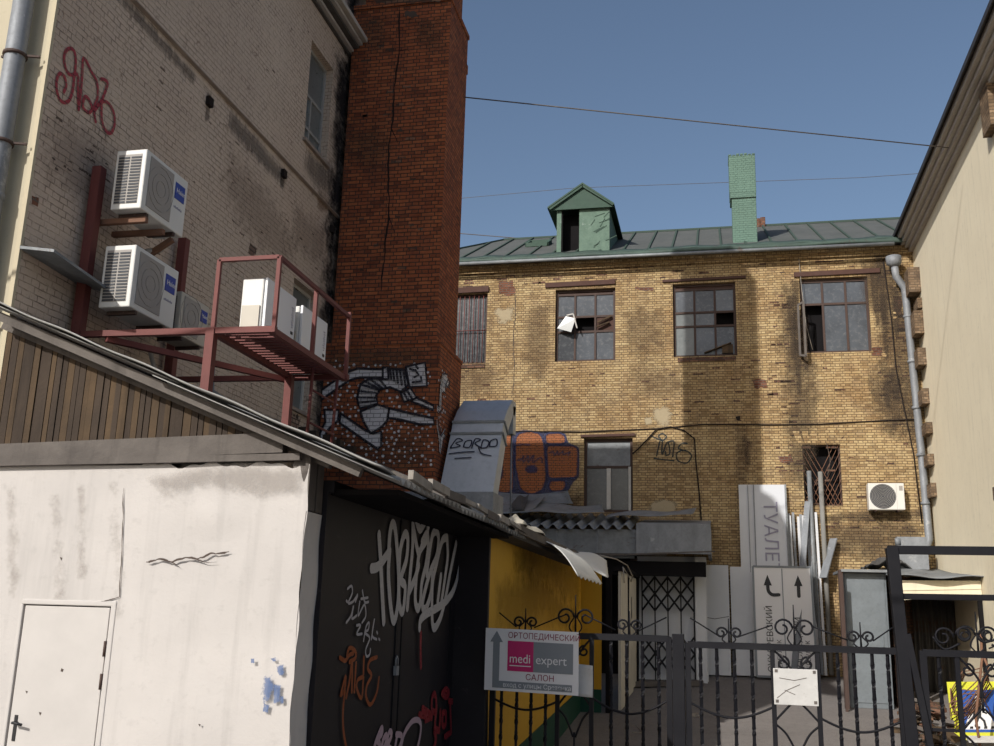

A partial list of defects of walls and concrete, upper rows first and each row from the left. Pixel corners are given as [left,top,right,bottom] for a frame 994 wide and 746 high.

water stain [231,118,285,186]
crack [381,6,410,289]
crack [101,488,124,602]
crack [147,551,229,565]